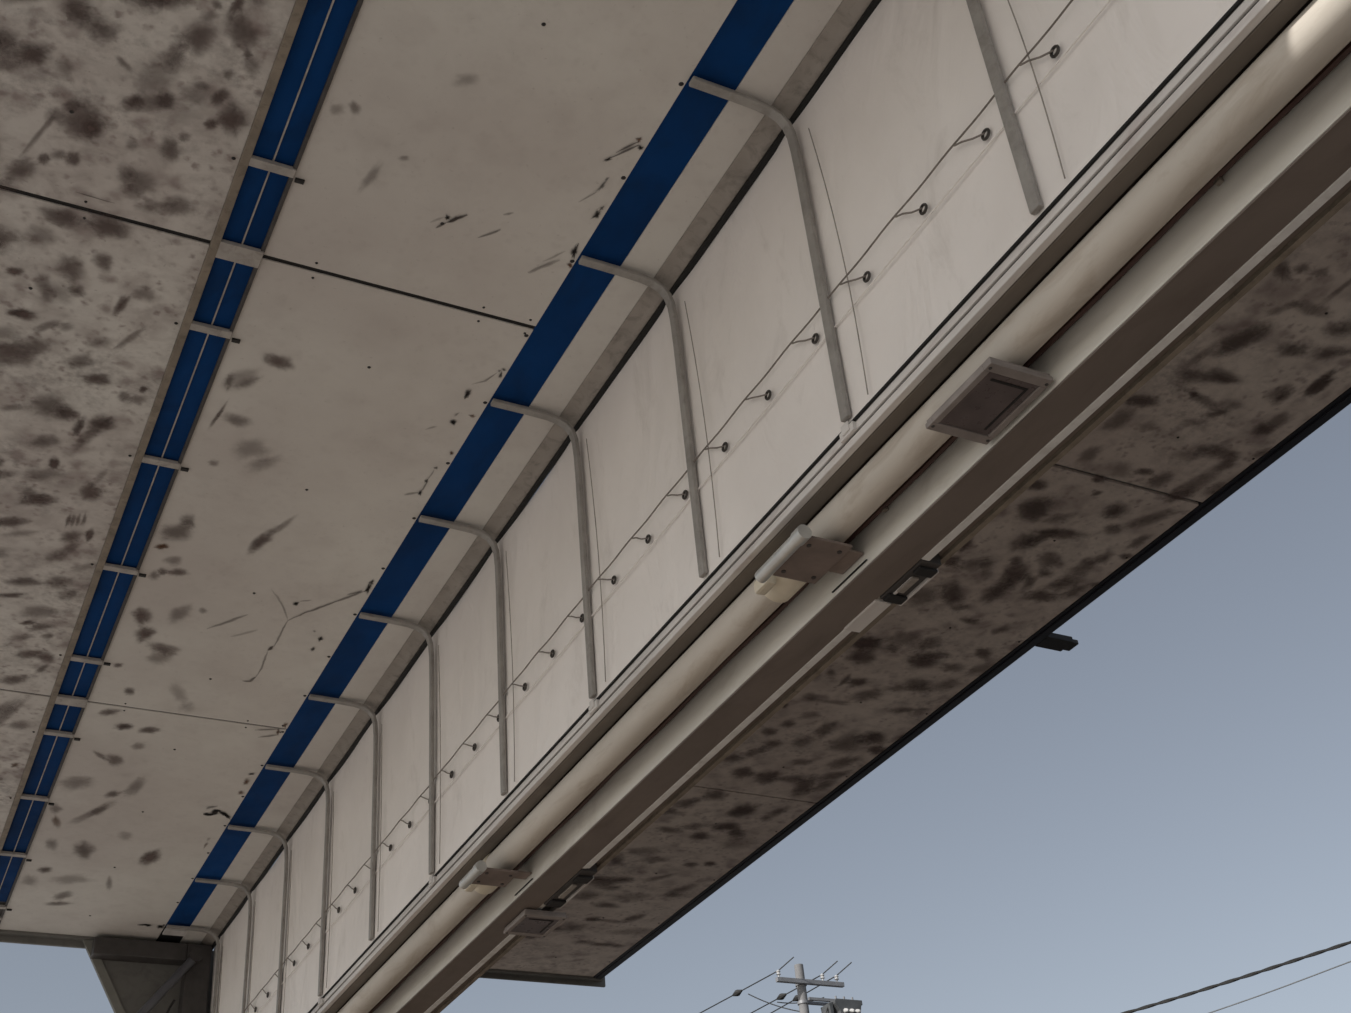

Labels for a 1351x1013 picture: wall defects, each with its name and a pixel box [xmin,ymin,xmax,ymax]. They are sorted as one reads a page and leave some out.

damp [205,91,244,129]
damp [47,211,126,236]
damp [11,310,33,319]
damp [75,359,107,384]
damp [22,495,52,504]
damp [251,532,271,550]
damp [986,530,1098,600]
damp [1,579,34,598]
crack [300,592,361,616]
damp [135,609,171,653]
damp [20,621,51,670]
damp [141,851,158,864]